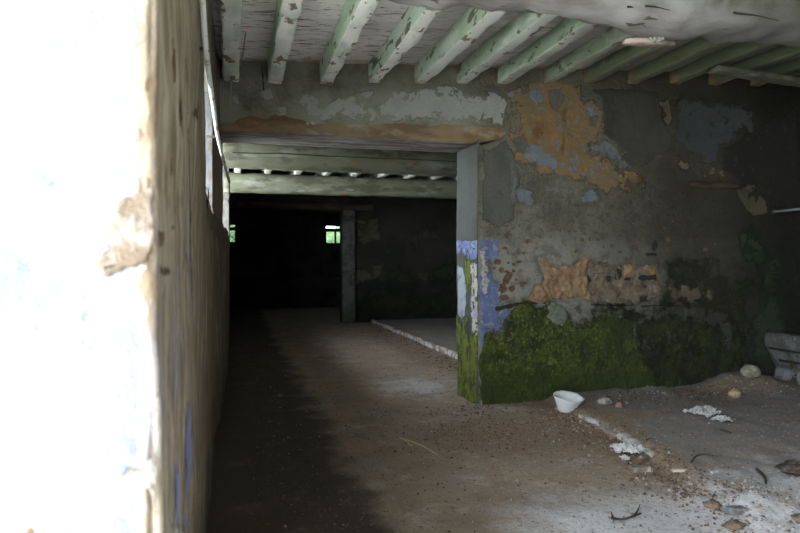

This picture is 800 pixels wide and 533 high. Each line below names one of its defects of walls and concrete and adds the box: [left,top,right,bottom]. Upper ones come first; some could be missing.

peeling [300,80,645,203]
peeling [658,96,754,180]
flaking render [95,187,175,276]
flaking render [457,232,713,346]